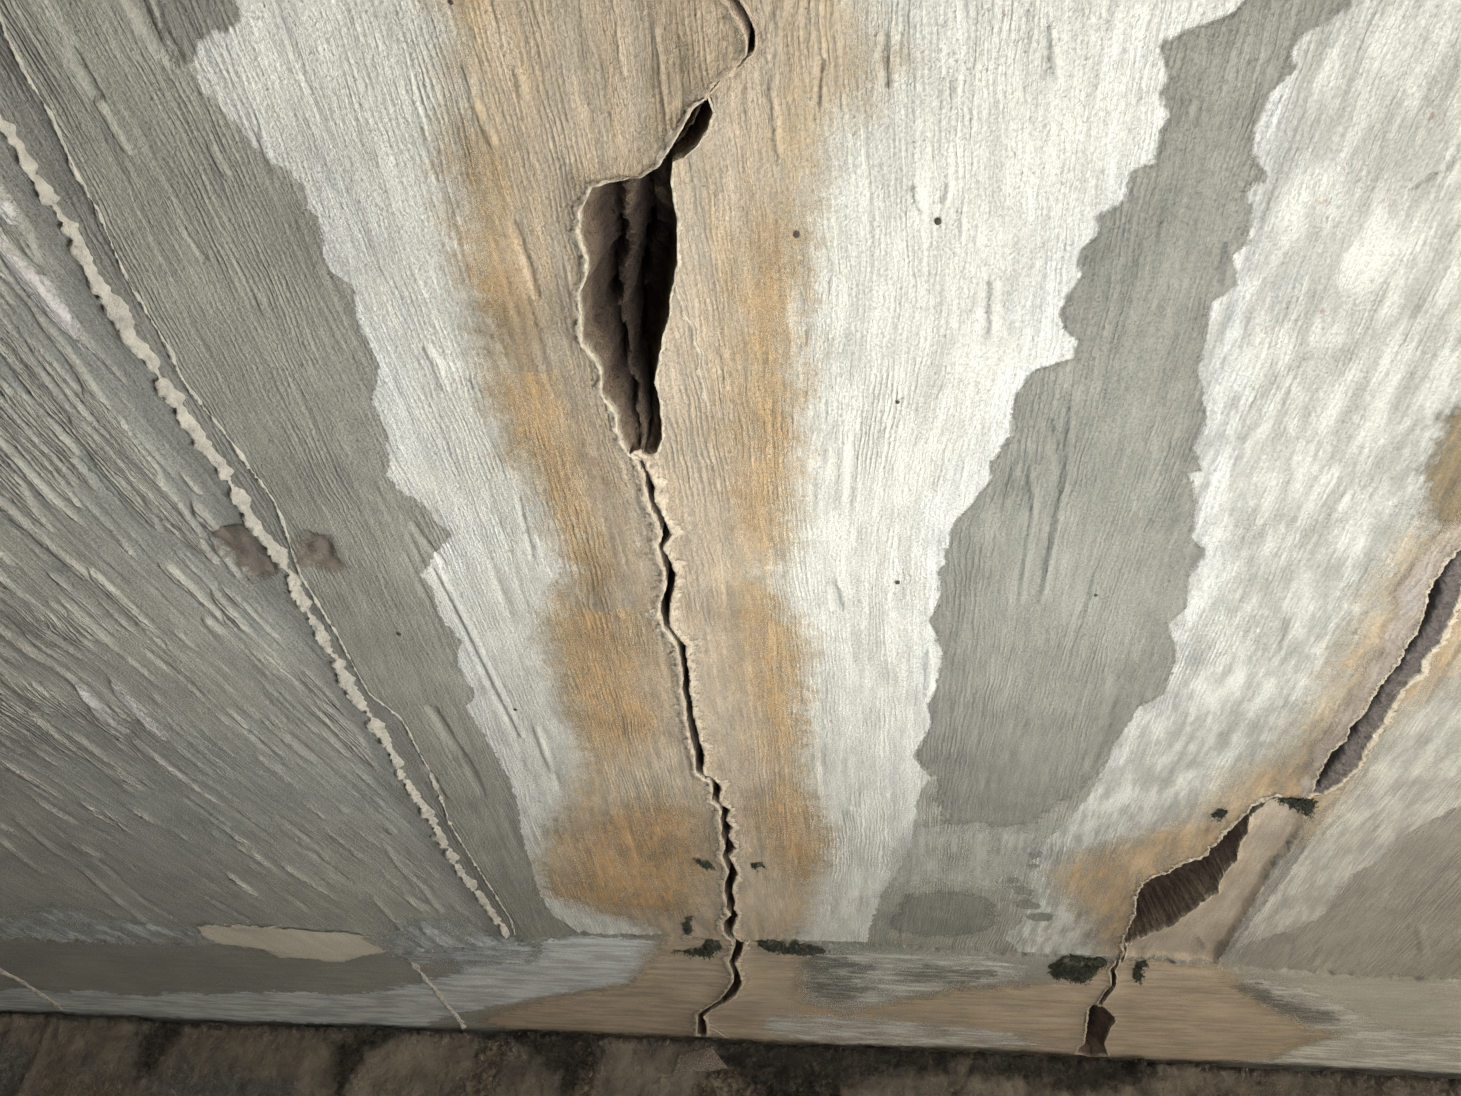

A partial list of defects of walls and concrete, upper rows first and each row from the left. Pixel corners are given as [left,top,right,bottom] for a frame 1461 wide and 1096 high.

water stain [0,0,666,1028]
crack [566,0,760,1038]
corrosion [455,0,1333,1064]
water stain [744,0,1461,1049]
crack [1073,541,1461,1057]
water stain [1232,974,1461,1075]